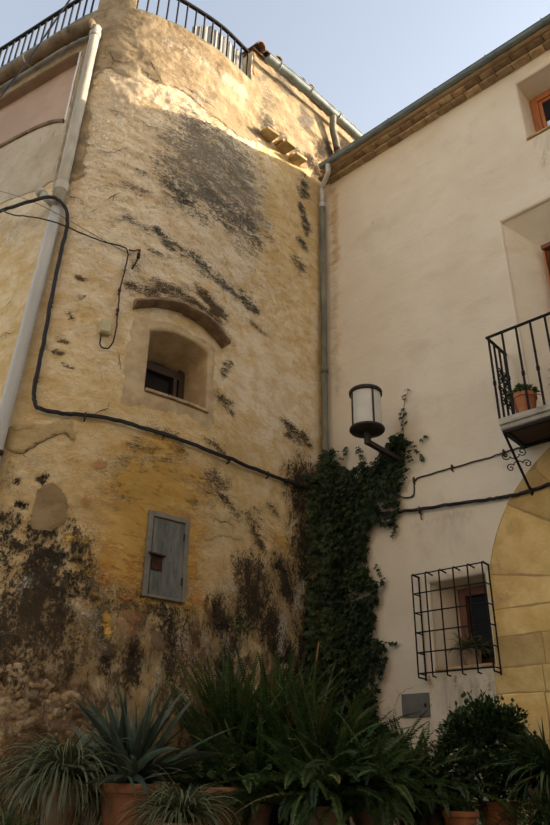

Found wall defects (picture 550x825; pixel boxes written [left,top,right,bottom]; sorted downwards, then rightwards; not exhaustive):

crack [110,50,217,125]
leakage [161,177,266,251]
leakage [119,213,270,337]
peeling [5,419,76,453]
leakage [0,416,316,698]
spalling [0,661,83,745]